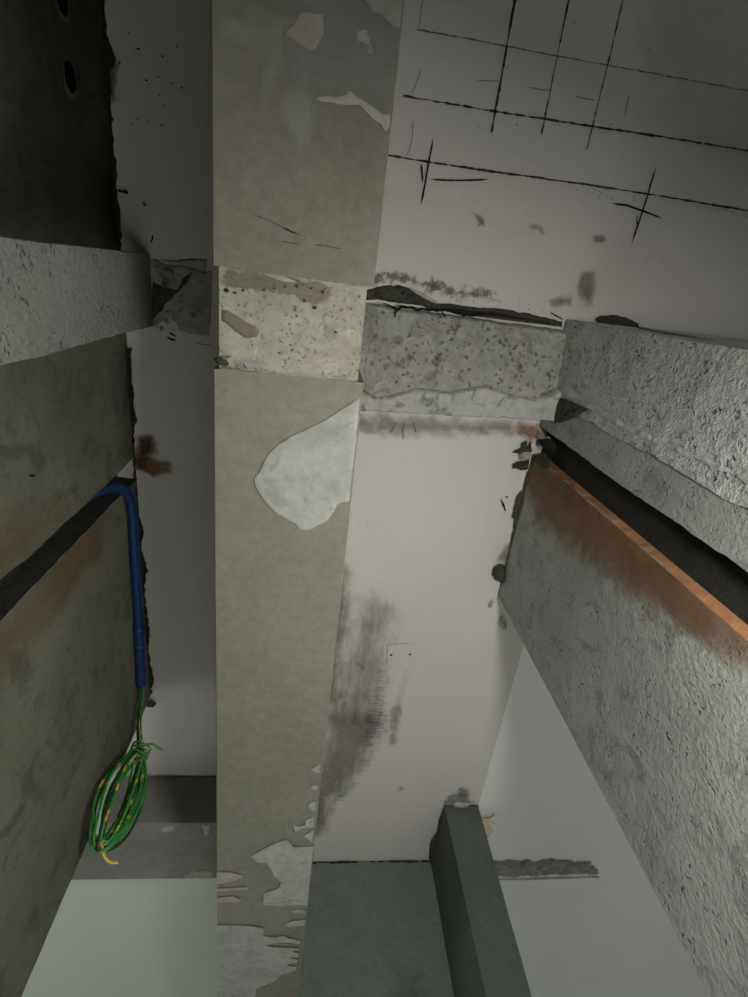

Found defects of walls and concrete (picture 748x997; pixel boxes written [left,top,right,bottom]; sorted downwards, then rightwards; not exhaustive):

peeling [317,91,390,131]
spalling [263,273,562,327]
crack [382,303,496,318]
spalling [214,355,306,376]
rust [136,436,170,477]
rust [528,461,748,650]
leakage [317,691,371,822]
peeling [217,840,314,997]